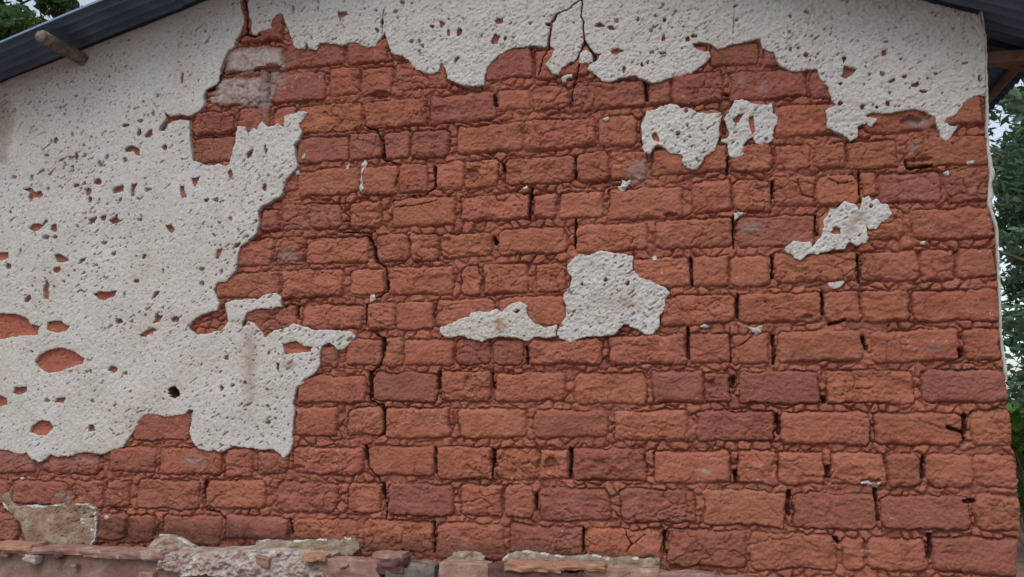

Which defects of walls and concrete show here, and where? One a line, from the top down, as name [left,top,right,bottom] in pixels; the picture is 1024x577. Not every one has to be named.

flaking render [0,0,1008,462]
crack [538,2,596,109]